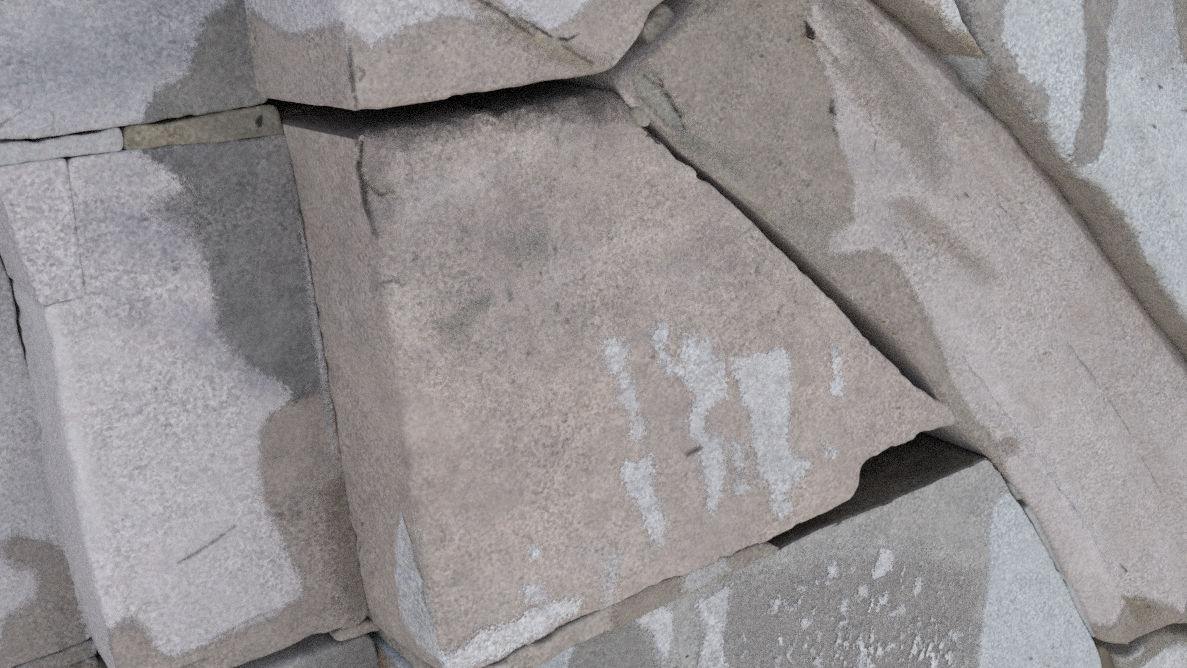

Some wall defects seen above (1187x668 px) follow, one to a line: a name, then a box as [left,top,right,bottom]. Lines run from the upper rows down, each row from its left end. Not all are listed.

leakage [107,0,1035,668]
leakage [872,0,1187,363]
leakage [1094,596,1187,668]